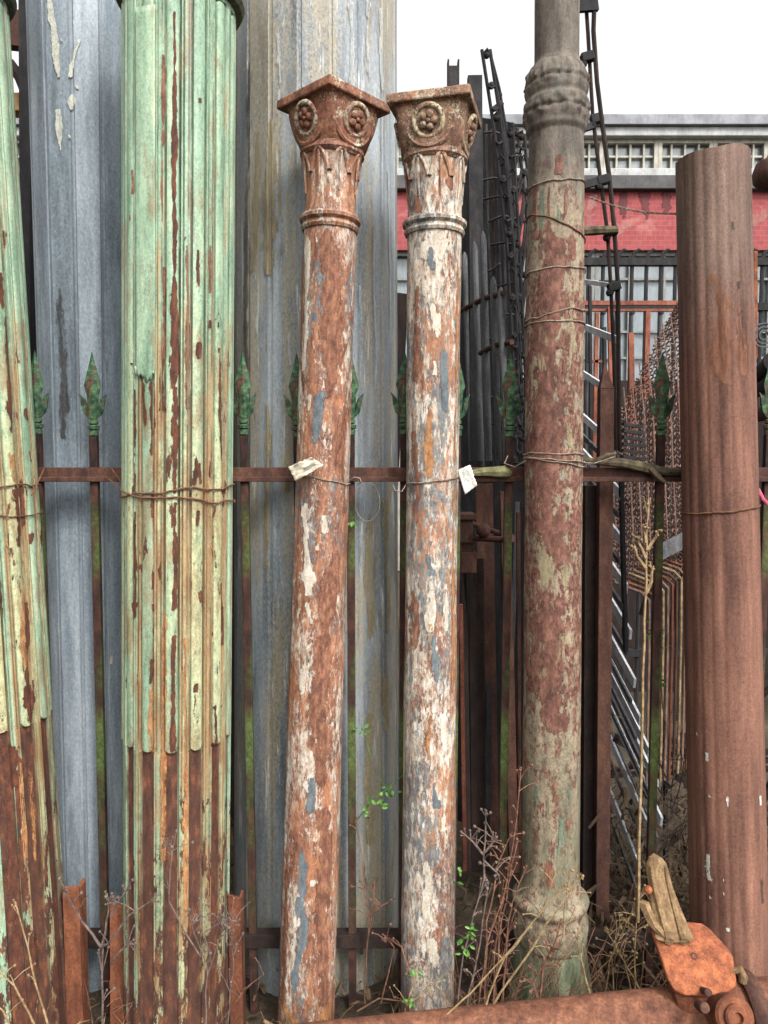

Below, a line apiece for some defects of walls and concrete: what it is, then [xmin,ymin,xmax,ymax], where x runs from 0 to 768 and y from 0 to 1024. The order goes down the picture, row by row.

peeling [47,0,81,151]
rust [318,228,348,398]
peeling [419,237,449,412]
peeling [142,359,166,456]
rust [336,405,347,514]
rust [305,551,340,788]
peeling [424,554,449,682]
rust [210,705,218,841]
peeling [0,743,40,1024]
rust [208,868,217,924]
rust [313,807,333,1007]
peeling [422,861,433,921]